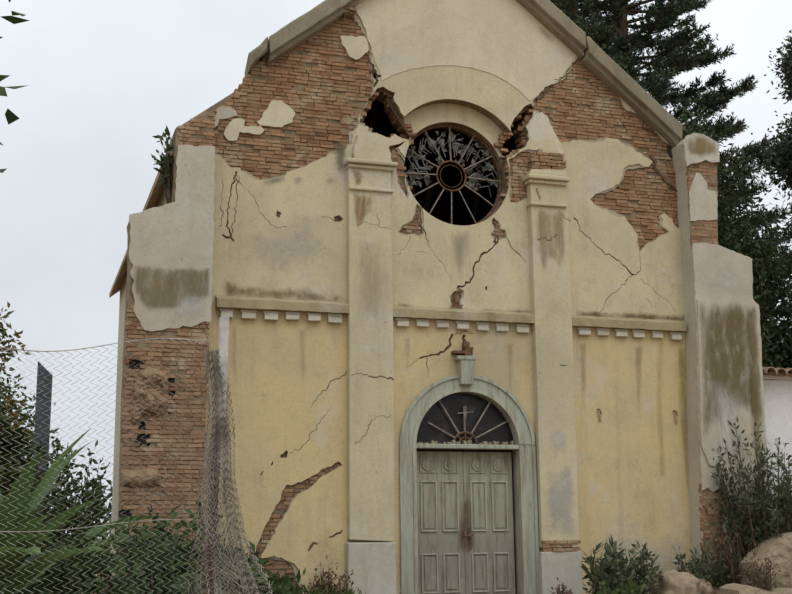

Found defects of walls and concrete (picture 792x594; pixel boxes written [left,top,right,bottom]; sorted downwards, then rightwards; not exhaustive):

crack [219,172,285,242]
flaking render [178,16,416,190]
crack [451,220,521,309]
water stain [539,213,563,262]
crack [534,60,578,102]
flaking render [494,59,679,249]
crack [537,210,668,313]
peeling [686,161,718,249]
flaking render [118,305,210,552]
crack [260,331,473,475]
water stain [719,394,736,452]
spalling [256,464,341,589]